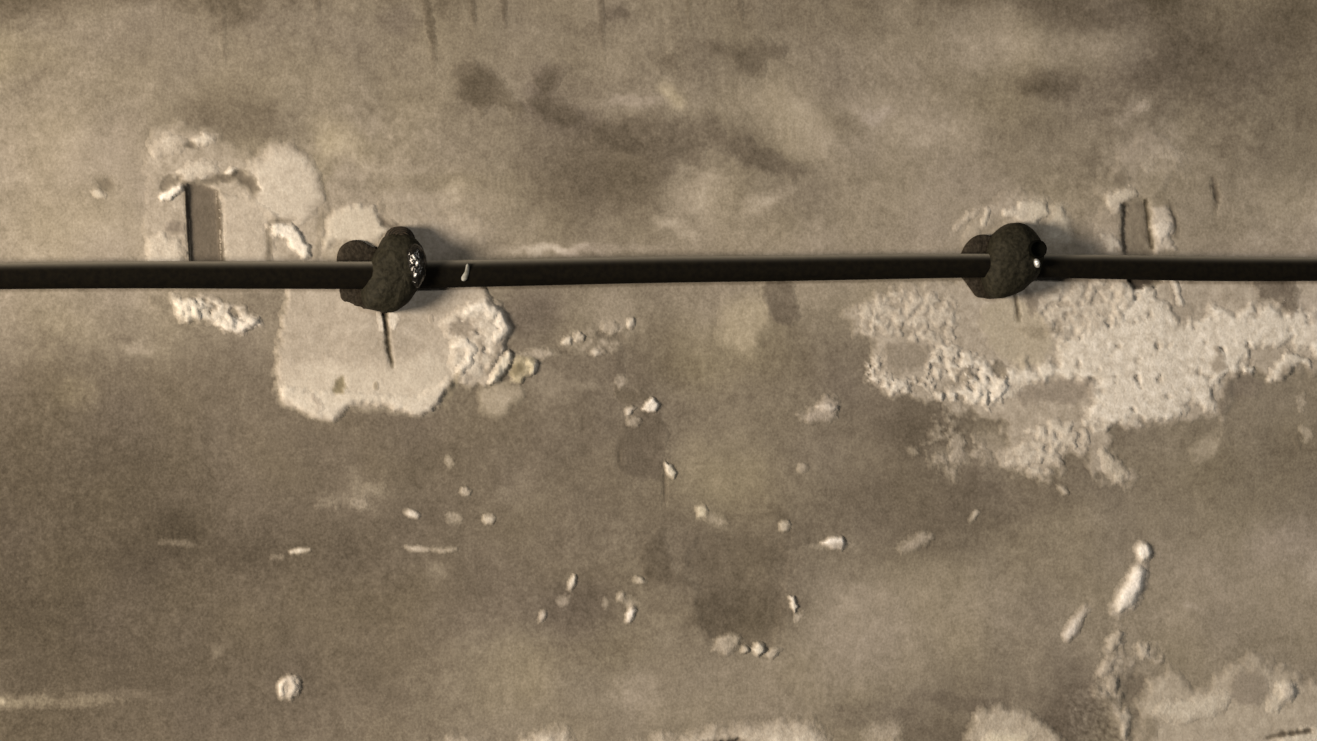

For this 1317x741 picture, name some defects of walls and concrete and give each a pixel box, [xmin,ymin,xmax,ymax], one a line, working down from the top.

leakage [0,0,325,66]
leakage [375,0,817,184]
leakage [905,0,1008,19]
peeling [136,116,494,262]
peeling [147,287,637,425]
leakage [838,278,1317,493]
leakage [961,540,1317,741]
leakage [516,720,588,741]
leakage [610,712,834,741]
leakage [859,715,911,741]